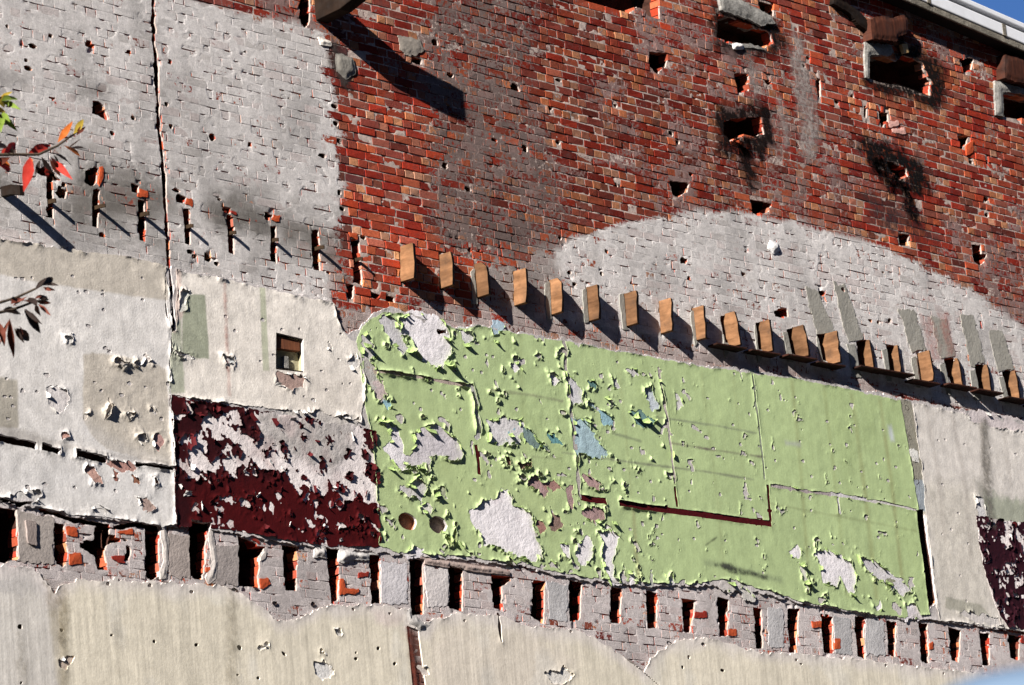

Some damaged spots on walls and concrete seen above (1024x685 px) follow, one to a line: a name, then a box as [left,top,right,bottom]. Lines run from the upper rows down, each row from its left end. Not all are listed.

spalling [584,0,658,17]
spalling [716,18,768,47]
spalling [869,44,929,93]
spalling [1003,99,1024,119]
crack [151,0,174,332]
damp [735,136,757,189]
damp [875,157,919,224]
peeling [138,293,473,549]
peeling [468,368,676,588]
spalling [61,504,133,565]
peeling [789,544,920,622]
peeling [960,496,1024,643]